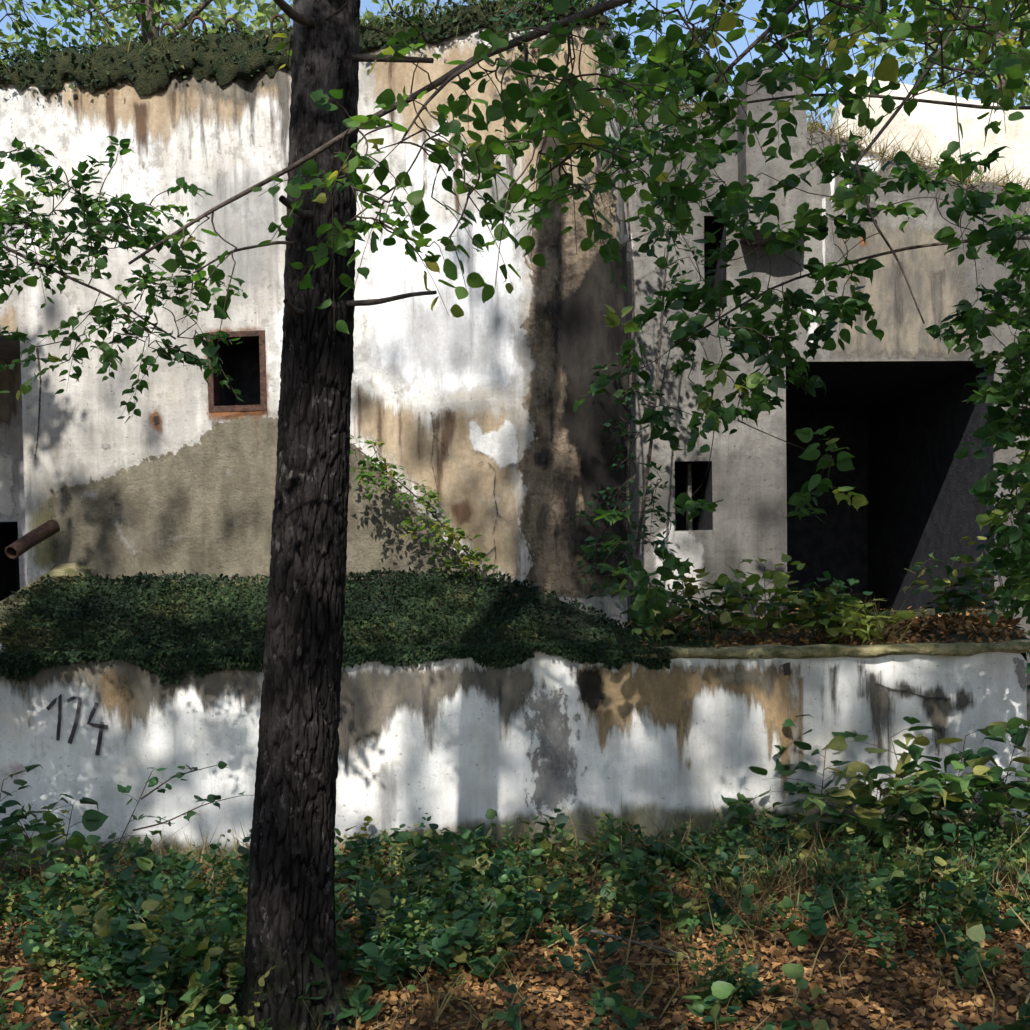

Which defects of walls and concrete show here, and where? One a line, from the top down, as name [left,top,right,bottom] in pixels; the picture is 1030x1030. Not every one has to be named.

leakage [30,67,290,164]
corrosion [149,411,162,431]
spalling [346,158,627,599]
peeling [48,411,278,584]
leakage [0,659,262,726]
leakage [338,663,544,769]
leakage [571,662,803,788]
leakage [858,664,973,762]